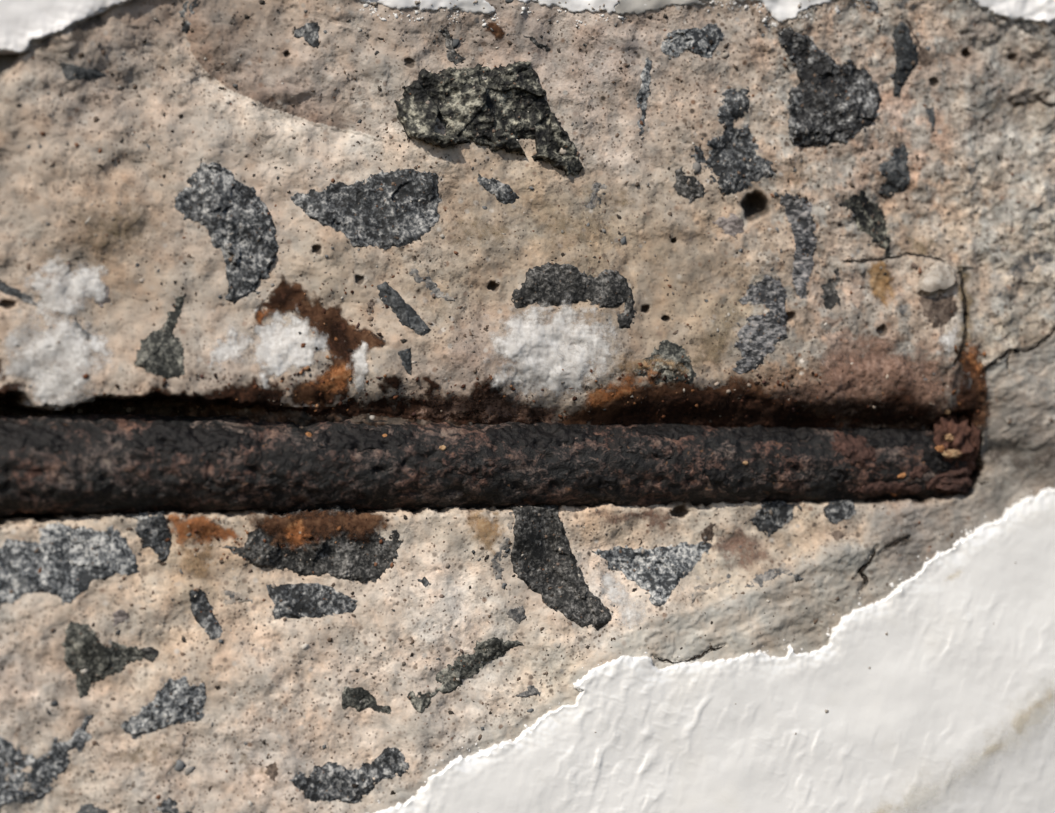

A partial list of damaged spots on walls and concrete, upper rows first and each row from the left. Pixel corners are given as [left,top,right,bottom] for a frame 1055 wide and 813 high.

spalling [0,0,1055,433]
rust [0,360,23,398]
damp [5,258,108,410]
damp [210,312,326,388]
damp [352,342,368,390]
damp [493,304,614,396]
crack [842,252,968,365]
crack [983,327,1055,371]
spalling [969,452,982,484]
spalling [0,487,1055,813]